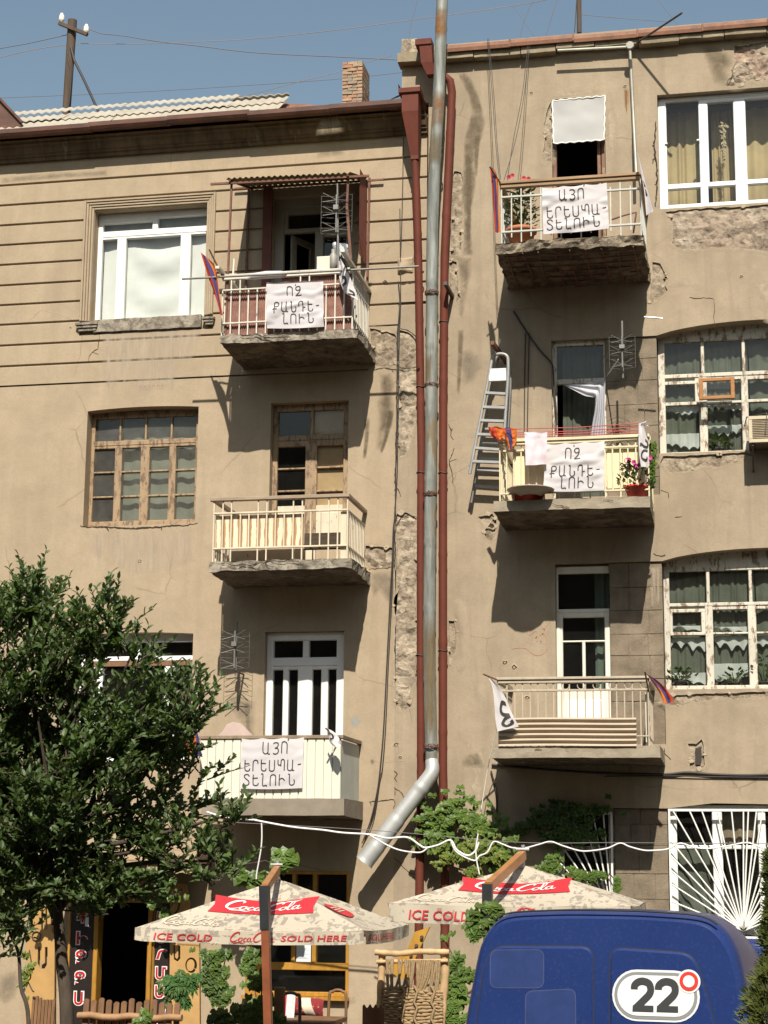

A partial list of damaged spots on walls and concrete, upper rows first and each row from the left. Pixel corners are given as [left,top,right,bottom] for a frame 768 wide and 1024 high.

flaking render [726,42,768,87]
damp [464,78,481,239]
spalling [504,246,668,304]
flaking render [369,328,416,370]
flaking render [364,510,417,569]